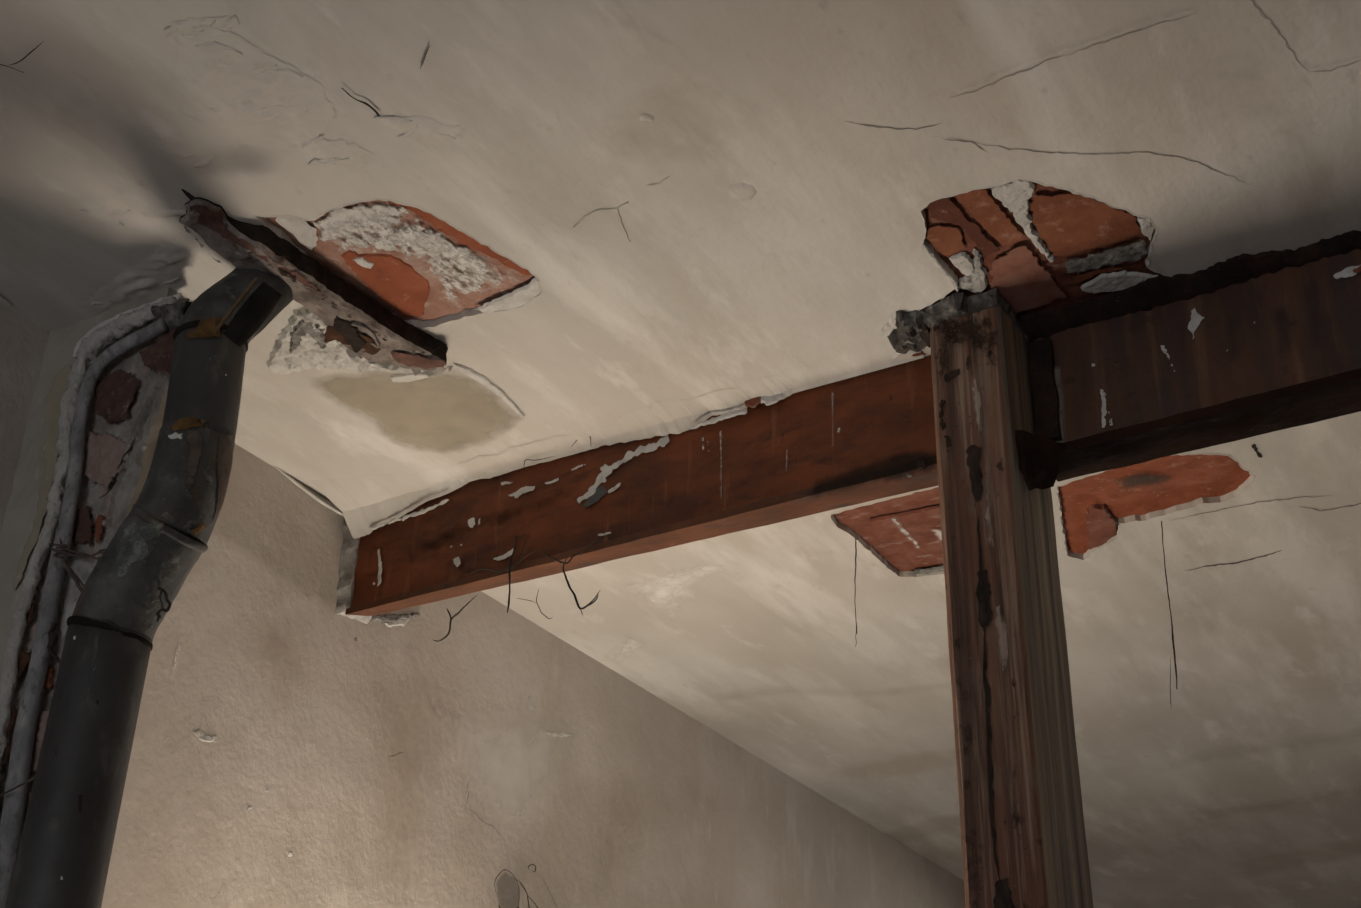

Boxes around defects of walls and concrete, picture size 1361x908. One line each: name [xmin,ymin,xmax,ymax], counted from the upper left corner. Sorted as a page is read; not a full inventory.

crack [1251,0,1360,72]
crack [847,13,1254,186]
flaking render [255,198,543,329]
flaking render [918,179,1171,318]
flaking render [266,306,453,376]
peeling [0,365,72,822]
flaking render [21,237,196,837]
flaking render [830,486,944,577]
flaking render [1055,453,1256,561]
crack [1190,551,1280,571]
crack [1170,495,1361,521]